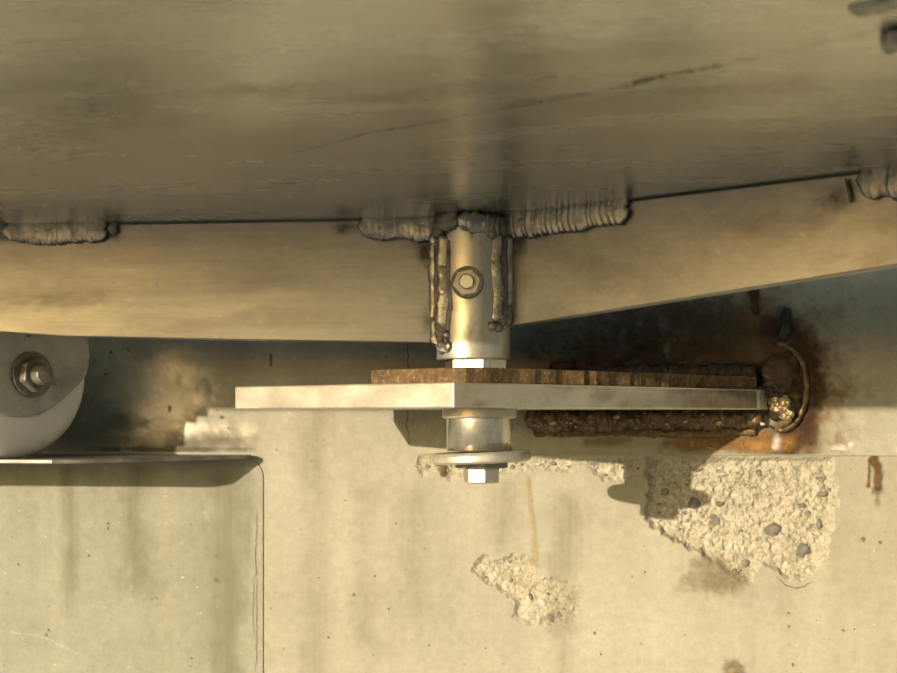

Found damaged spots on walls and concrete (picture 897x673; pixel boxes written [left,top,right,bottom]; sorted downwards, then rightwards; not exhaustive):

corrosion [550,360,635,371]
corrosion [663,289,830,454]
spalling [413,455,464,483]
spalling [499,440,853,583]
corrosion [867,456,882,491]
spalling [467,552,582,629]